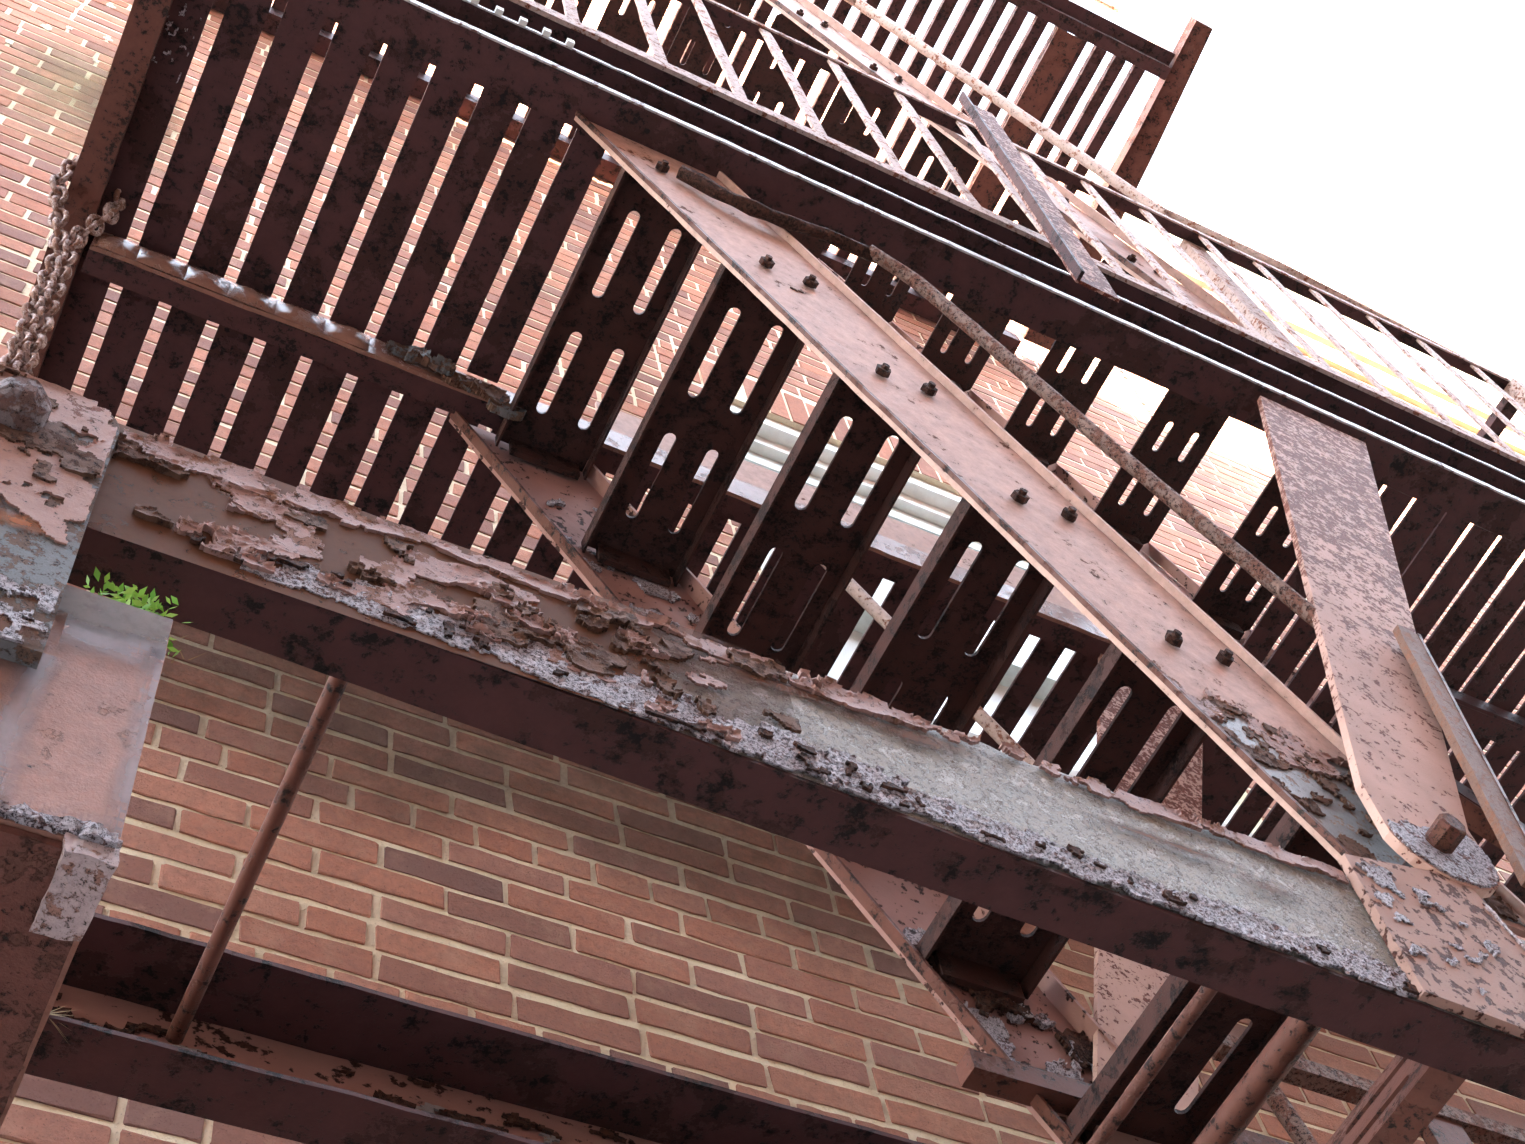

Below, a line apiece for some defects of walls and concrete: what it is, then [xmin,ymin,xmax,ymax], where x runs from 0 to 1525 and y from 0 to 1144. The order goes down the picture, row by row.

peeling [0,364,1417,998]
peeling [1151,660,1525,927]
peeling [902,927,1093,1082]